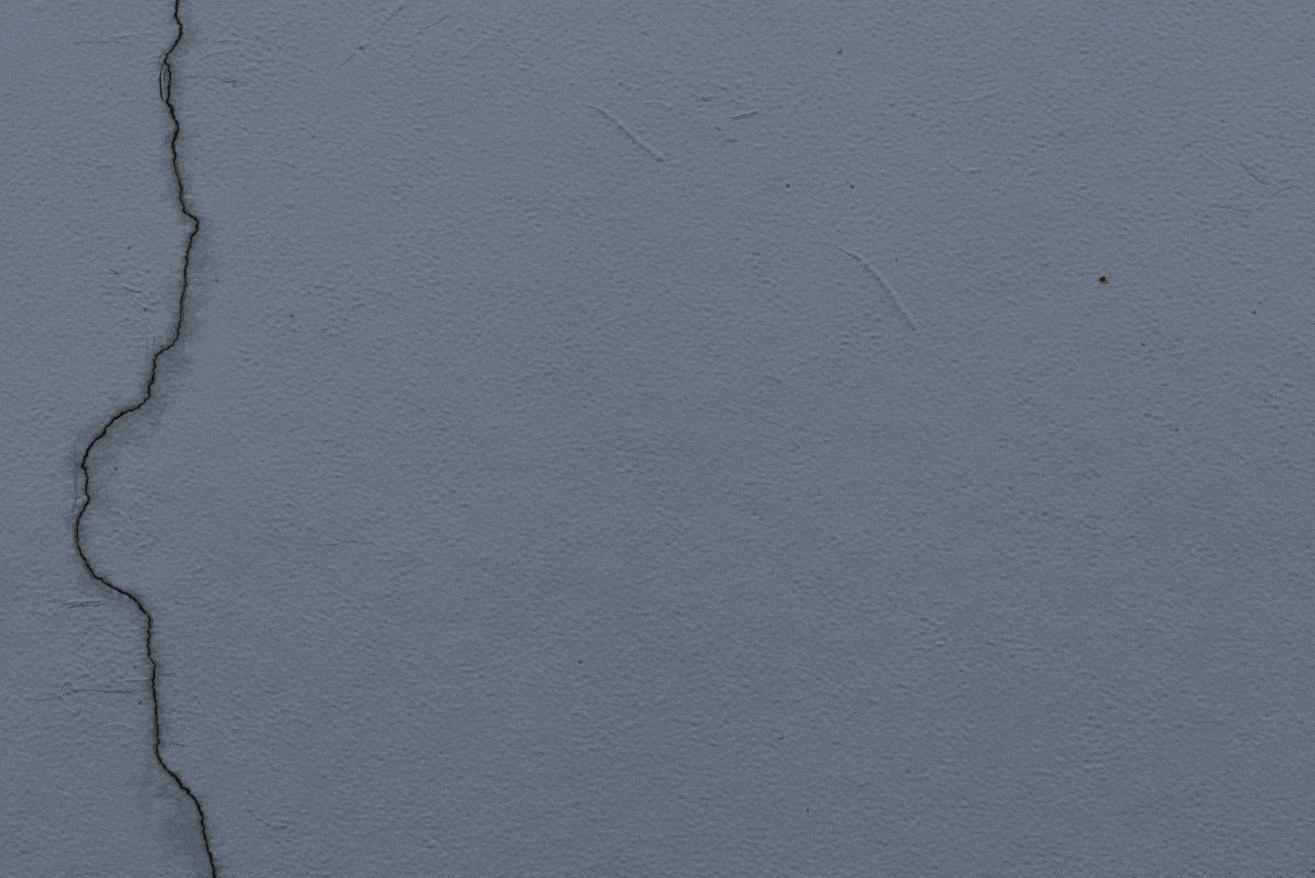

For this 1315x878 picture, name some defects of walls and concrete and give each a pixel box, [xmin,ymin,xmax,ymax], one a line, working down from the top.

crack [26,0,243,878]